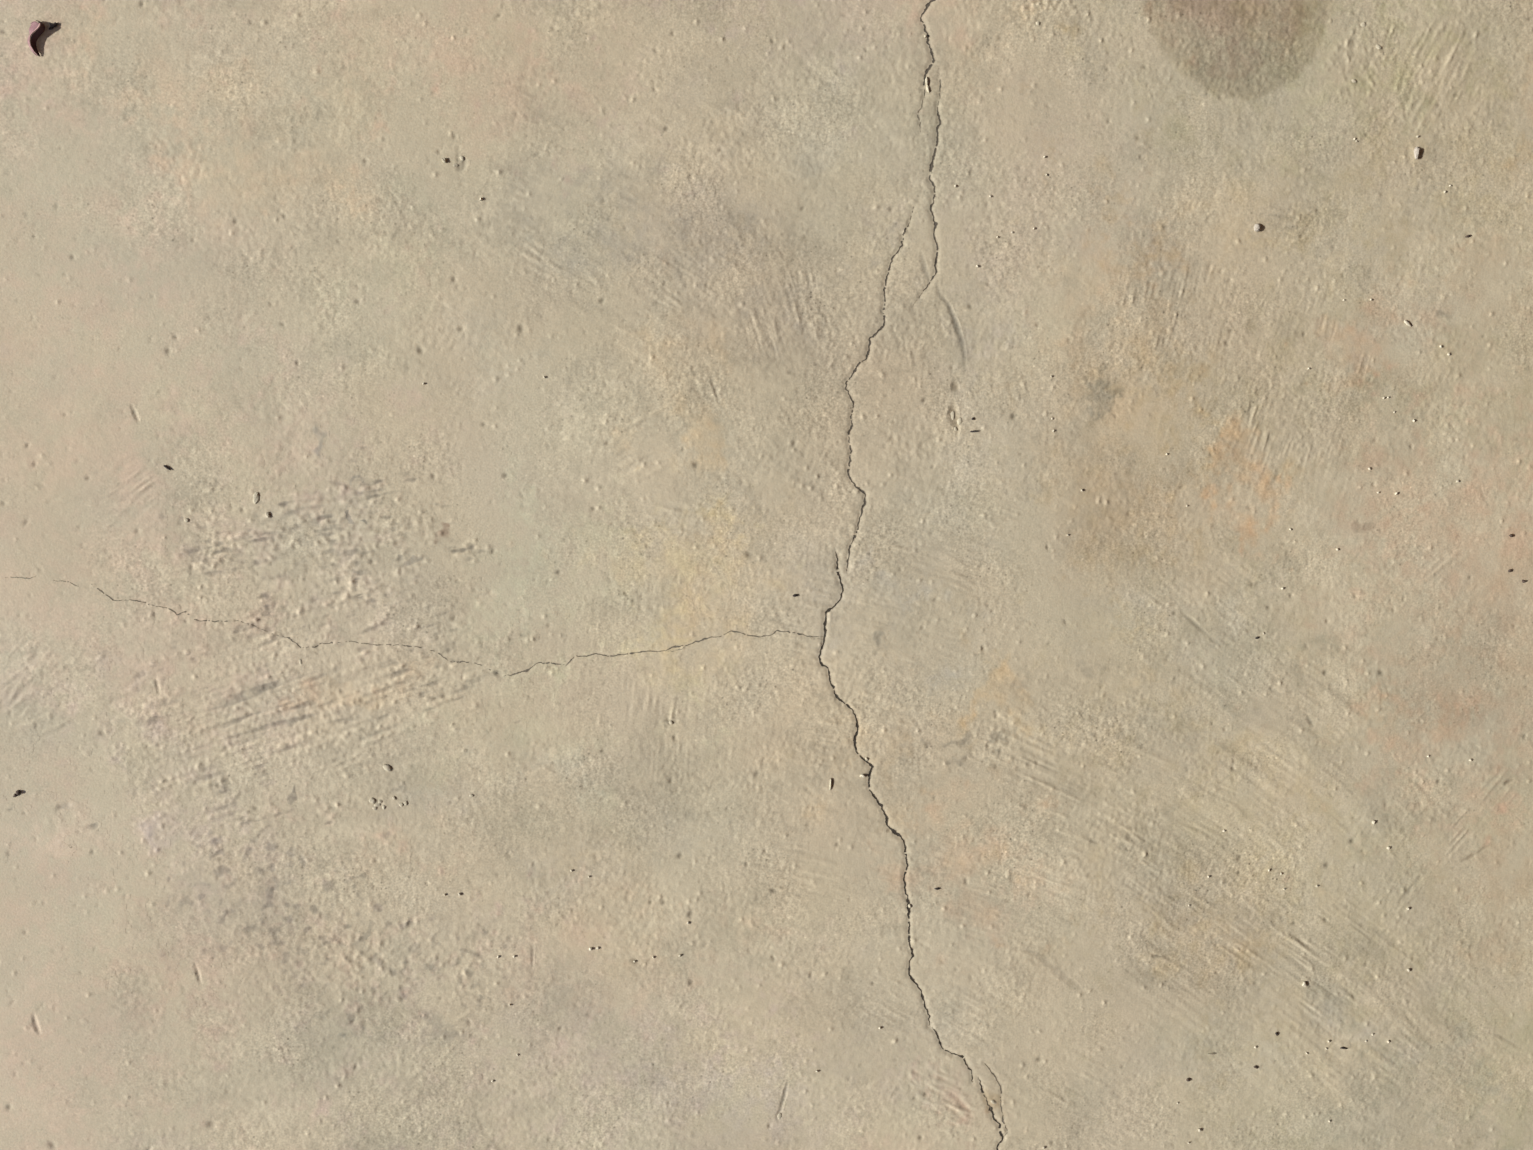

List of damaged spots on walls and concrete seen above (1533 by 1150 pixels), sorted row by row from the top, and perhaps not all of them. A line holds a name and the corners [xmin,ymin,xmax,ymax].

crack [11,0,1007,1150]
damp [1138,0,1337,103]